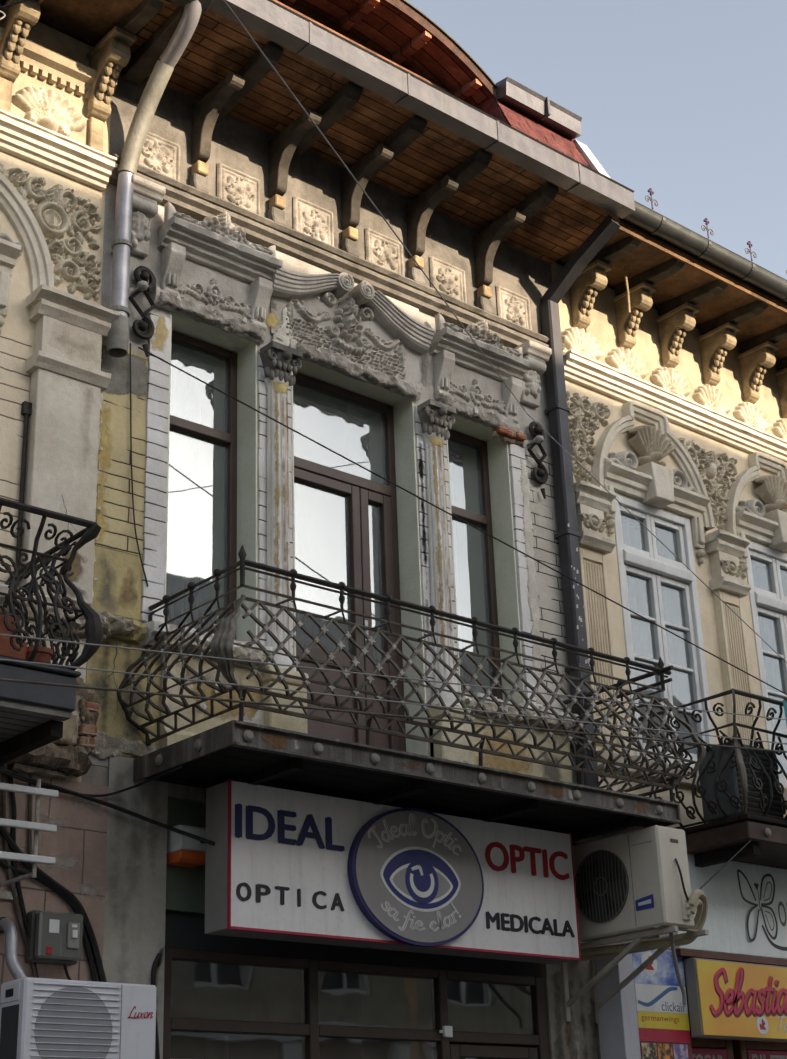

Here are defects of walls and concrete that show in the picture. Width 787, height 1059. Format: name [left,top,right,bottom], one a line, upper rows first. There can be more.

spalling [0,677,159,780]